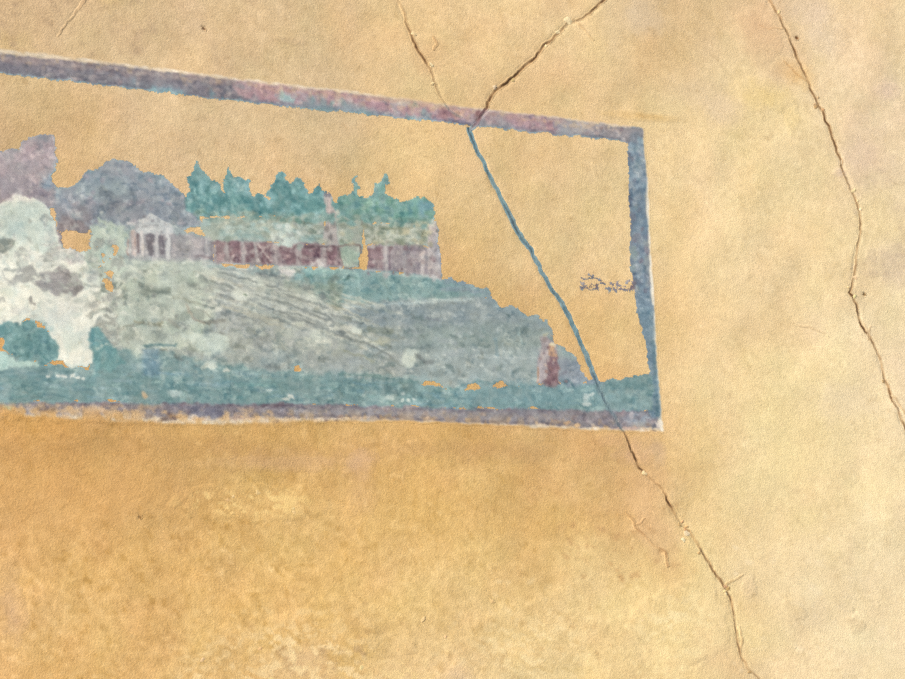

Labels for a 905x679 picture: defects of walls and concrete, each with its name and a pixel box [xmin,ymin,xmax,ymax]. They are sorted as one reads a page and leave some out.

crack [396,0,761,679]
crack [759,0,905,433]